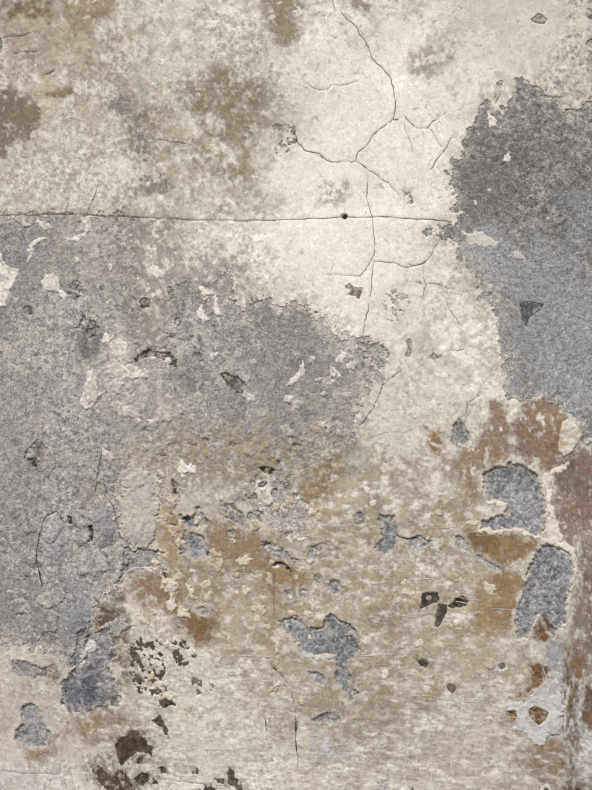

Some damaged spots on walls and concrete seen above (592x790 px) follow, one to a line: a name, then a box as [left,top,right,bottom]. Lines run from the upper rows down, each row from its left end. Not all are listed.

flaking render [13,703,51,748]
crack [1,185,212,220]
flaking render [0,207,390,717]
flaking render [310,711,340,725]
water stain [129,442,537,774]
crack [233,3,461,337]
peeling [400,579,469,628]
flaking render [423,77,592,642]
corrosion [455,397,592,790]
peeling [532,14,547,24]